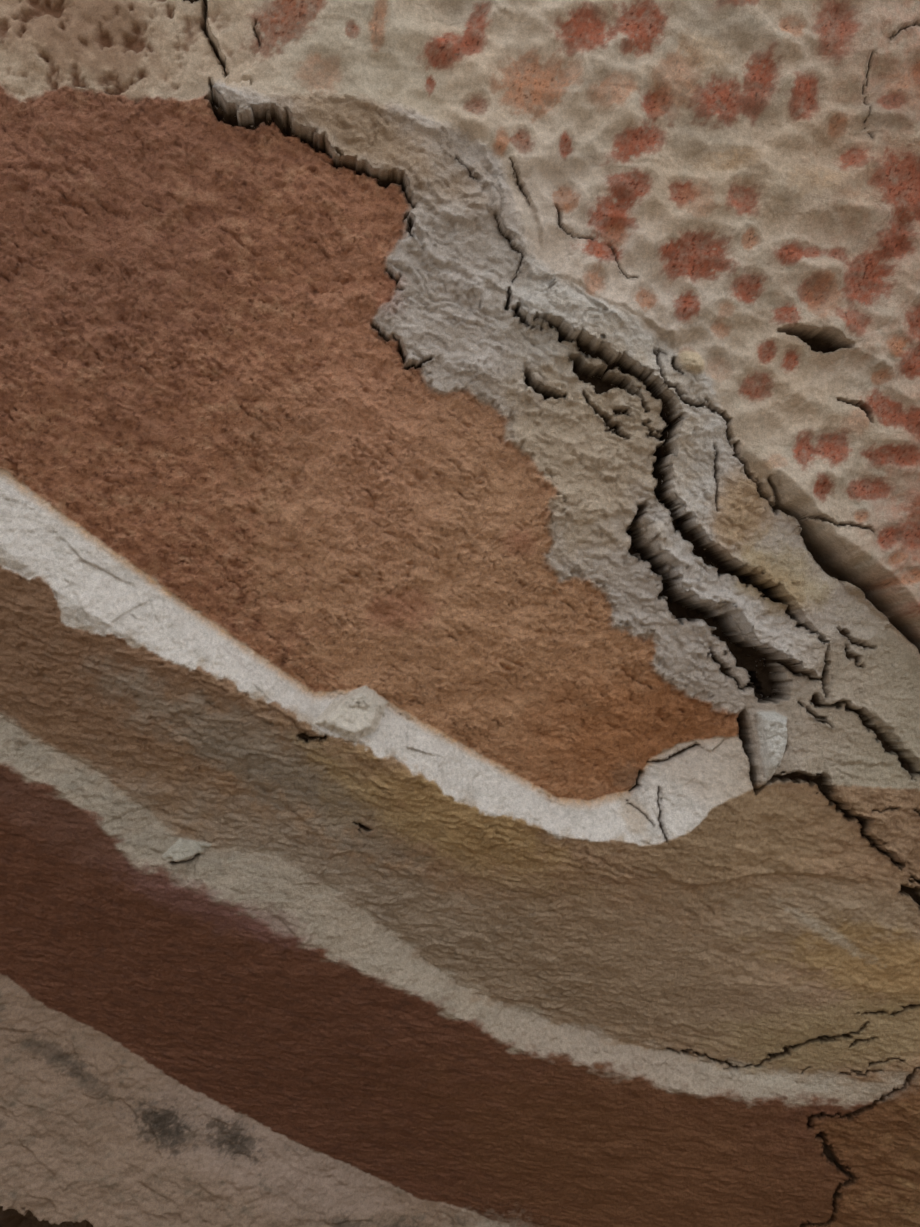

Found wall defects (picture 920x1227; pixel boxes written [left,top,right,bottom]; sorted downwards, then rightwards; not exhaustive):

crack [182,0,418,237]
crack [455,154,480,182]
crack [383,266,405,291]
crack [370,319,434,370]
spalling [0,83,740,801]
crack [492,156,920,911]
rust [705,446,821,625]
crack [352,820,373,834]
crack [664,1004,920,1227]